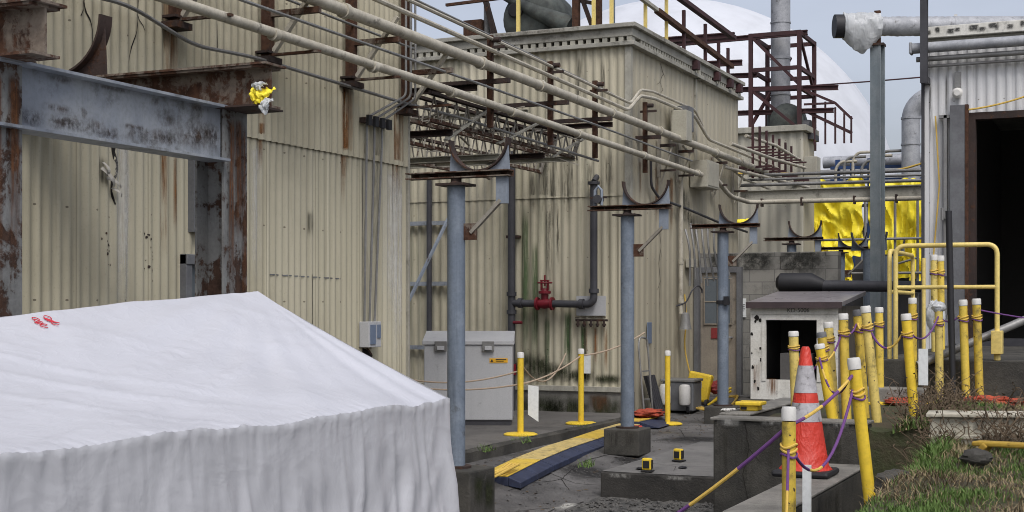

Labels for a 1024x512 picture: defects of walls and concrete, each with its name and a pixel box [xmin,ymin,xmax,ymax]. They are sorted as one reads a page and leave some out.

corrosion [0,77,19,215]
corrosion [229,122,246,291]
corrosion [341,88,349,167]
damp [522,220,549,364]
damp [565,315,585,360]